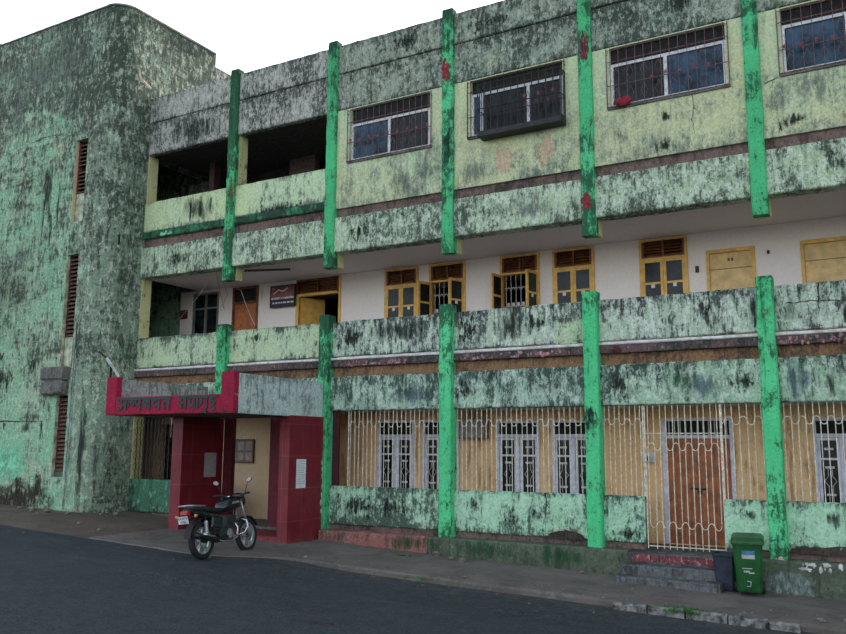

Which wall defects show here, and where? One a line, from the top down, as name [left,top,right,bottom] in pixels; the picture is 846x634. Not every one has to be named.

leakage [172,117,217,142]
leakage [778,113,805,131]
leakage [41,167,62,245]
leakage [185,200,211,219]
crack [786,283,846,314]
peeling [777,332,846,345]
leakage [612,375,630,403]
leakage [0,476,50,508]
spalling [775,544,846,574]